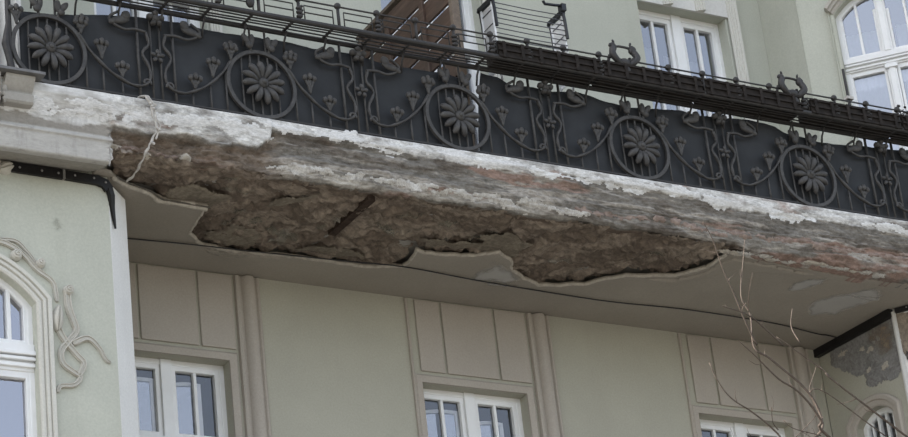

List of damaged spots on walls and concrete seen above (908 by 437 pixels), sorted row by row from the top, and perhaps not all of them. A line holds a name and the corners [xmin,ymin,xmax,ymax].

crack [0,75,8,107]
peeling [26,95,845,224]
flaking render [109,143,908,287]
peeling [830,312,908,387]